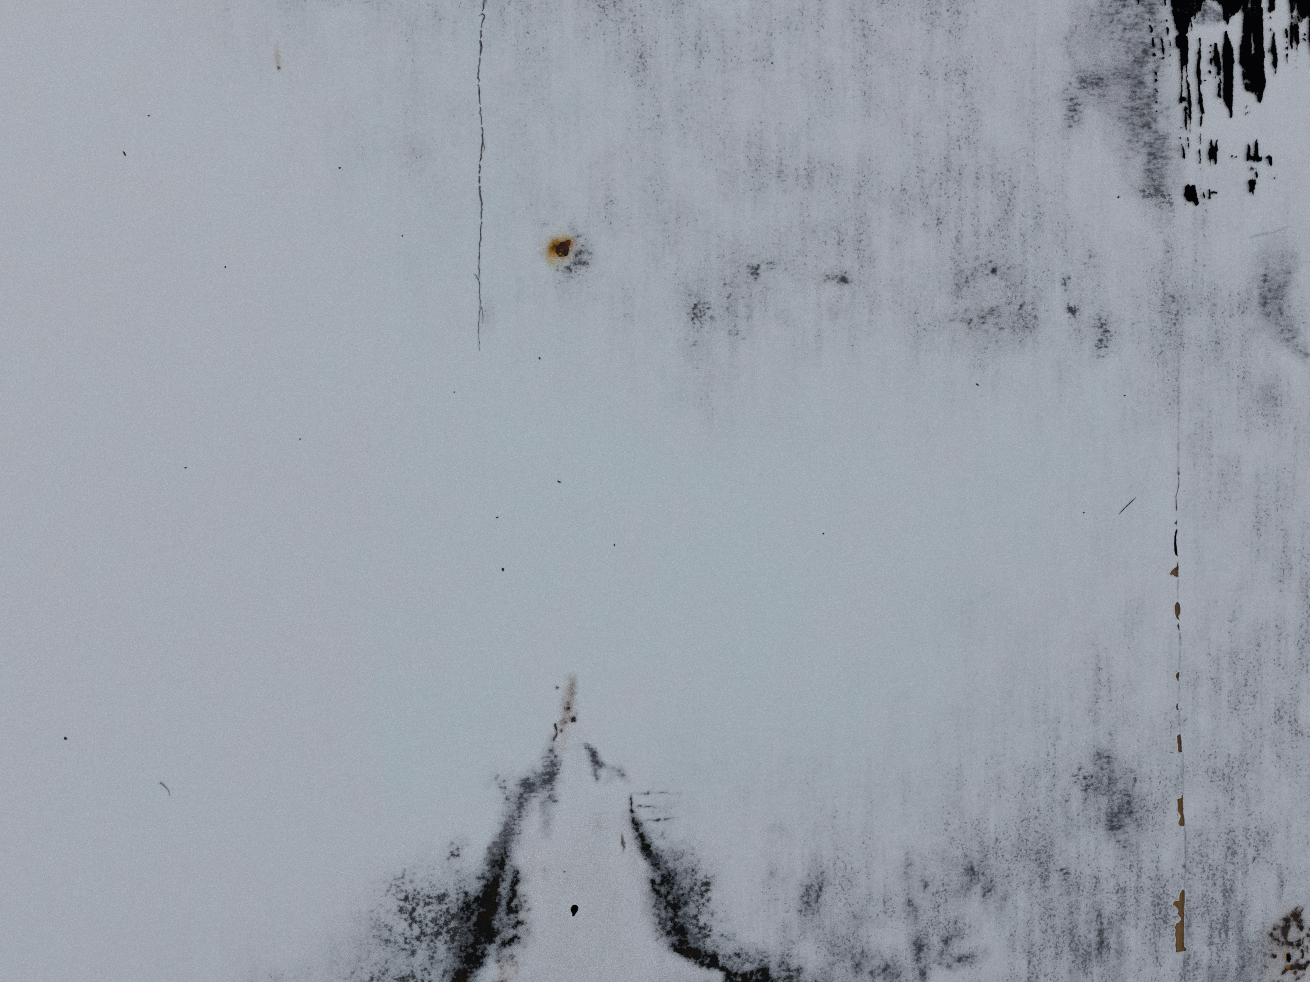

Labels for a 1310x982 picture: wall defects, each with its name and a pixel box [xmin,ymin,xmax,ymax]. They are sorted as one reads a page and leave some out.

peeling [1149,0,1310,195]
crack [475,0,487,350]
peeling [1184,184,1217,206]
rust [546,238,572,264]
spalling [1173,601,1182,632]
leakage [585,744,624,780]
spalling [1176,794,1186,827]
leakage [345,747,561,982]
leakage [621,791,832,982]
leakage [955,861,1007,901]
leakage [844,921,975,982]
spalling [1172,889,1188,953]